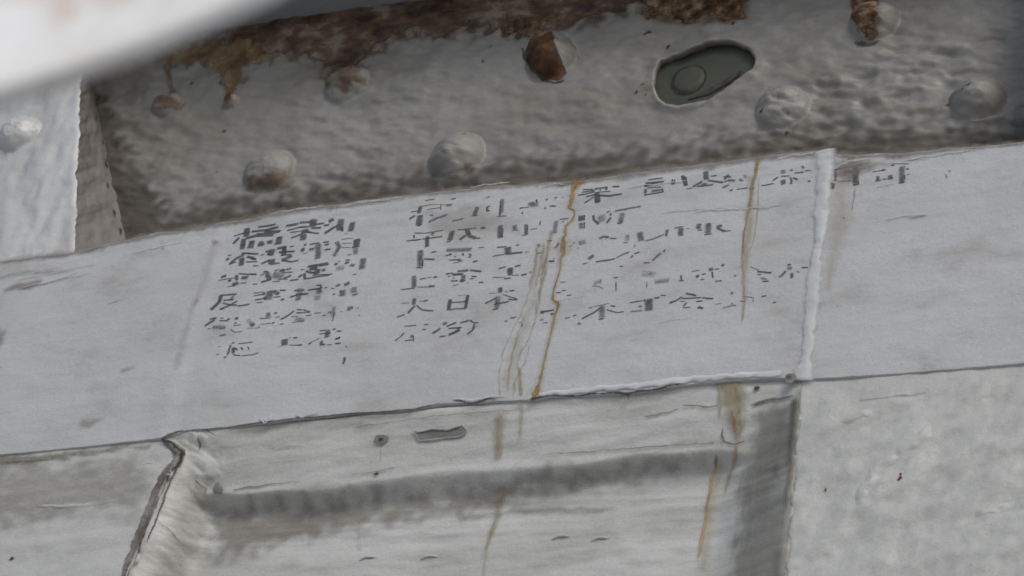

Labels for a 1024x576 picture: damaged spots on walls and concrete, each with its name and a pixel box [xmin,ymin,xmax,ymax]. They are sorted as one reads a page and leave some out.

corrosion [151,0,749,118]
corrosion [742,155,761,255]
spalling [414,425,467,441]
corrosion [718,382,743,433]
water stain [775,400,797,506]
corrosion [698,457,717,555]